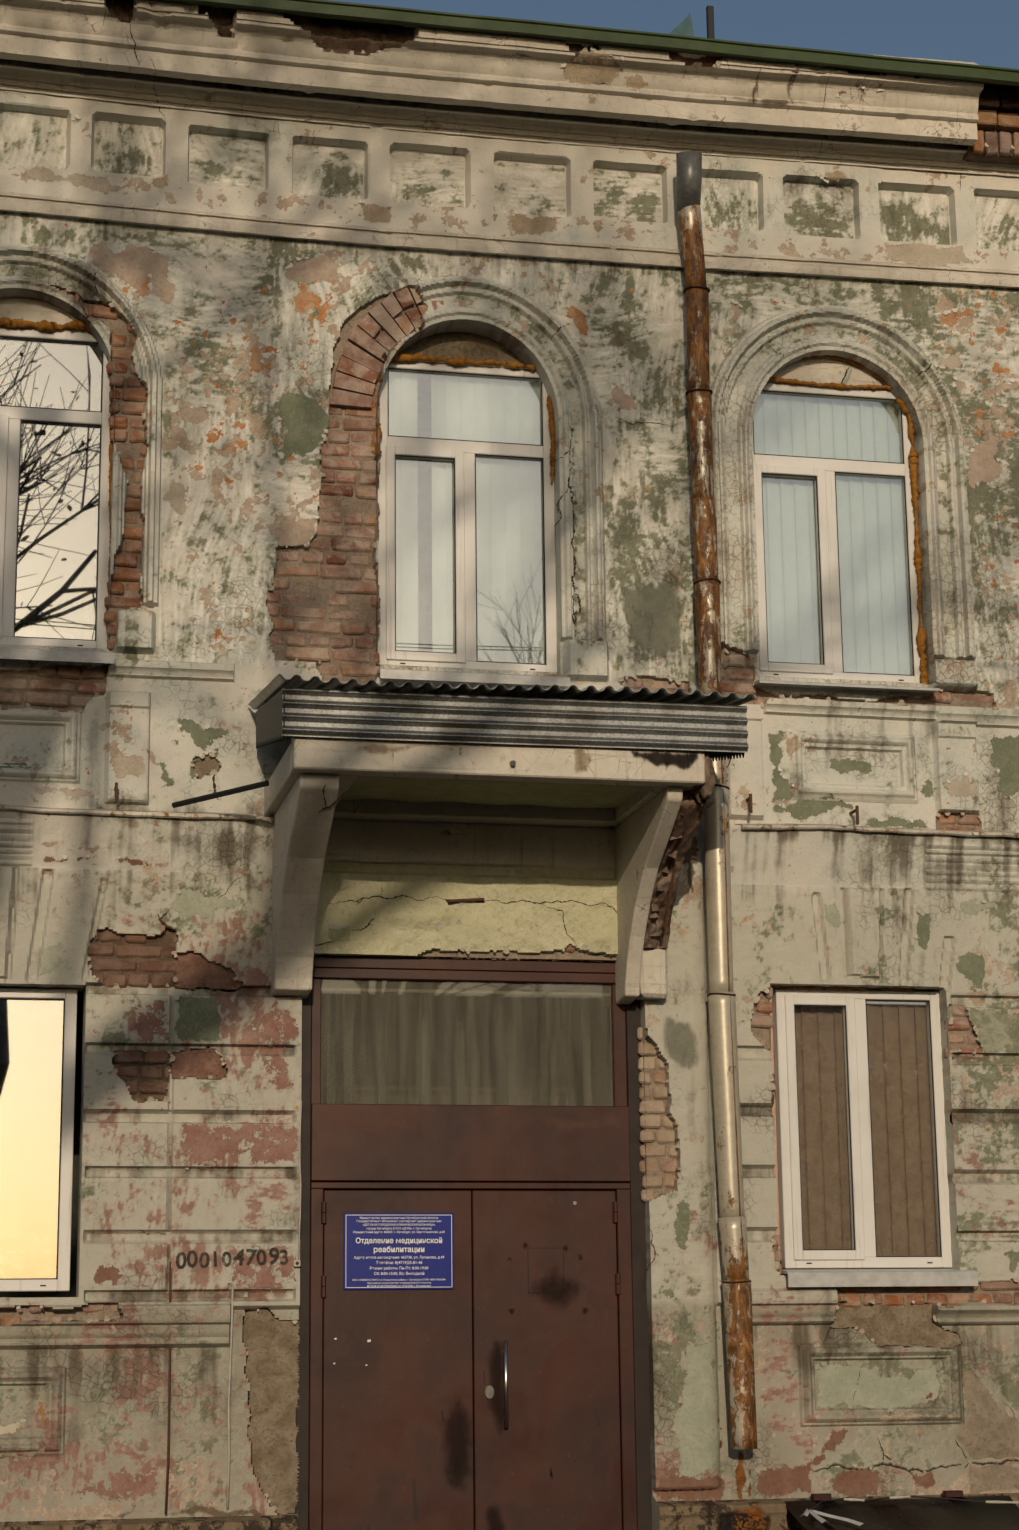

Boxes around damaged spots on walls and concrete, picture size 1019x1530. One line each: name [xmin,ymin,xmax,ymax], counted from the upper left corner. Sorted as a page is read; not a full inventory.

spalling [106,0,138,23]
spalling [283,14,415,56]
spalling [959,83,1019,165]
spalling [0,288,148,713]
spalling [266,280,466,684]
crack [315,889,445,946]
crack [484,900,617,946]
spalling [87,929,242,1103]
spalling [637,1027,693,1250]
spalling [229,1243,300,1514]
rust [733,1452,769,1530]
crack [813,1437,1019,1473]